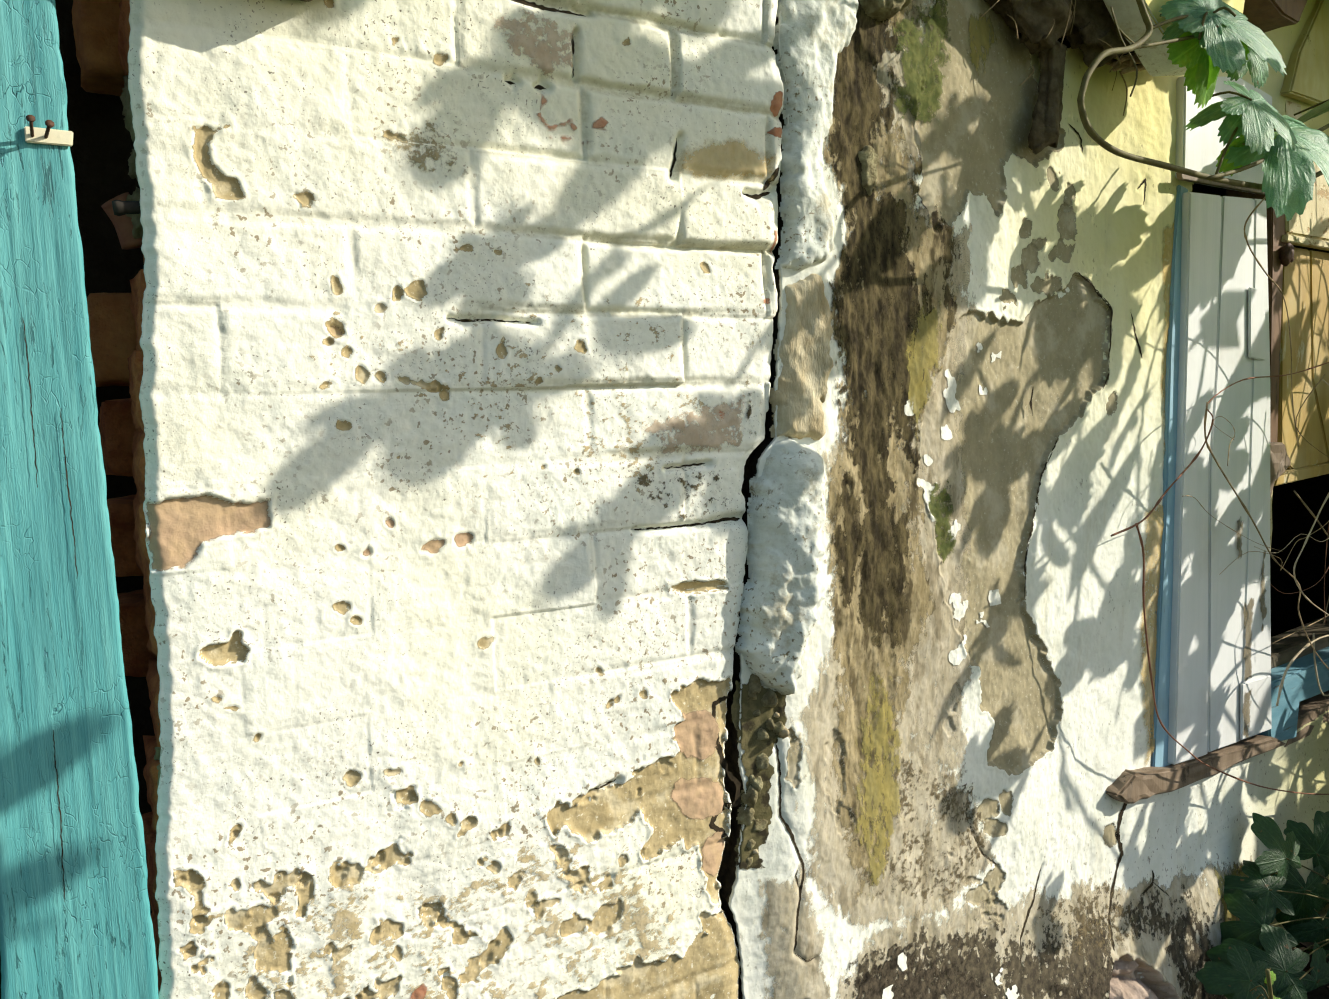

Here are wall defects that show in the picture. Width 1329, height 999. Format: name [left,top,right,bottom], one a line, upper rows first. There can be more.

crack [763,167,779,190]
flaking render [146,495,271,571]
crack [741,445,759,521]
damp [758,0,1252,999]
flaking render [913,0,1118,838]
spalling [200,630,250,666]
peeling [333,601,362,625]
spalling [174,673,803,999]
crack [709,691,741,917]
crack [775,738,815,962]
peeling [964,864,1008,927]
crack [1108,803,1169,951]